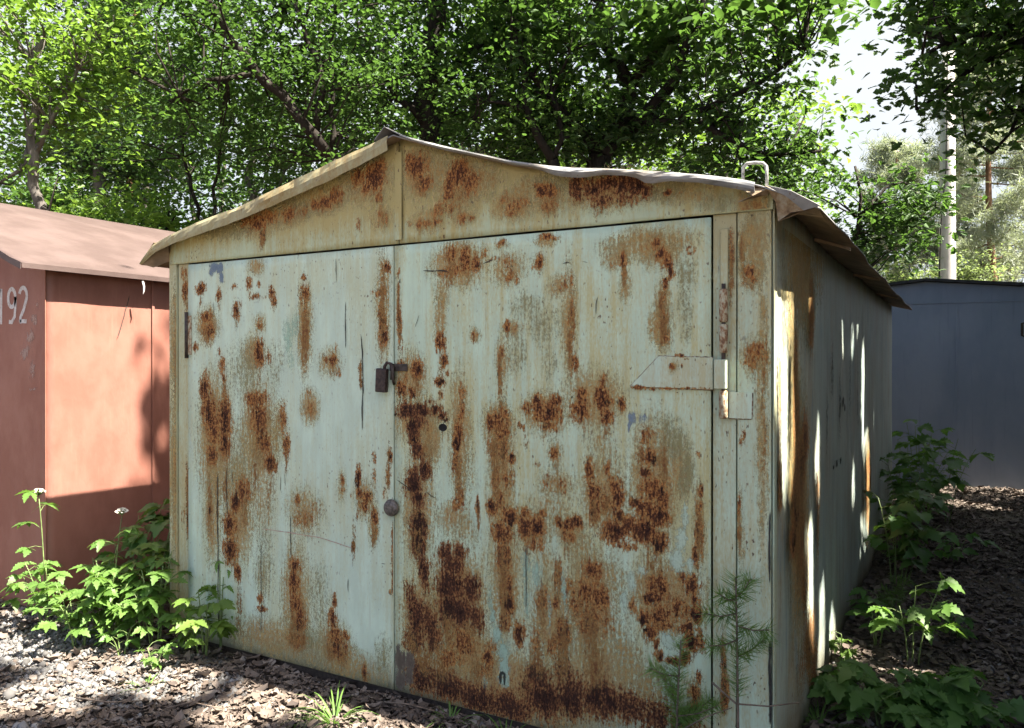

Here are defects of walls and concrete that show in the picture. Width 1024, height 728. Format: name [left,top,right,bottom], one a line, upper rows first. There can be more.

rust [169,147,485,685]
rust [338,228,710,728]
rust [492,169,683,222]
rust [728,192,823,695]